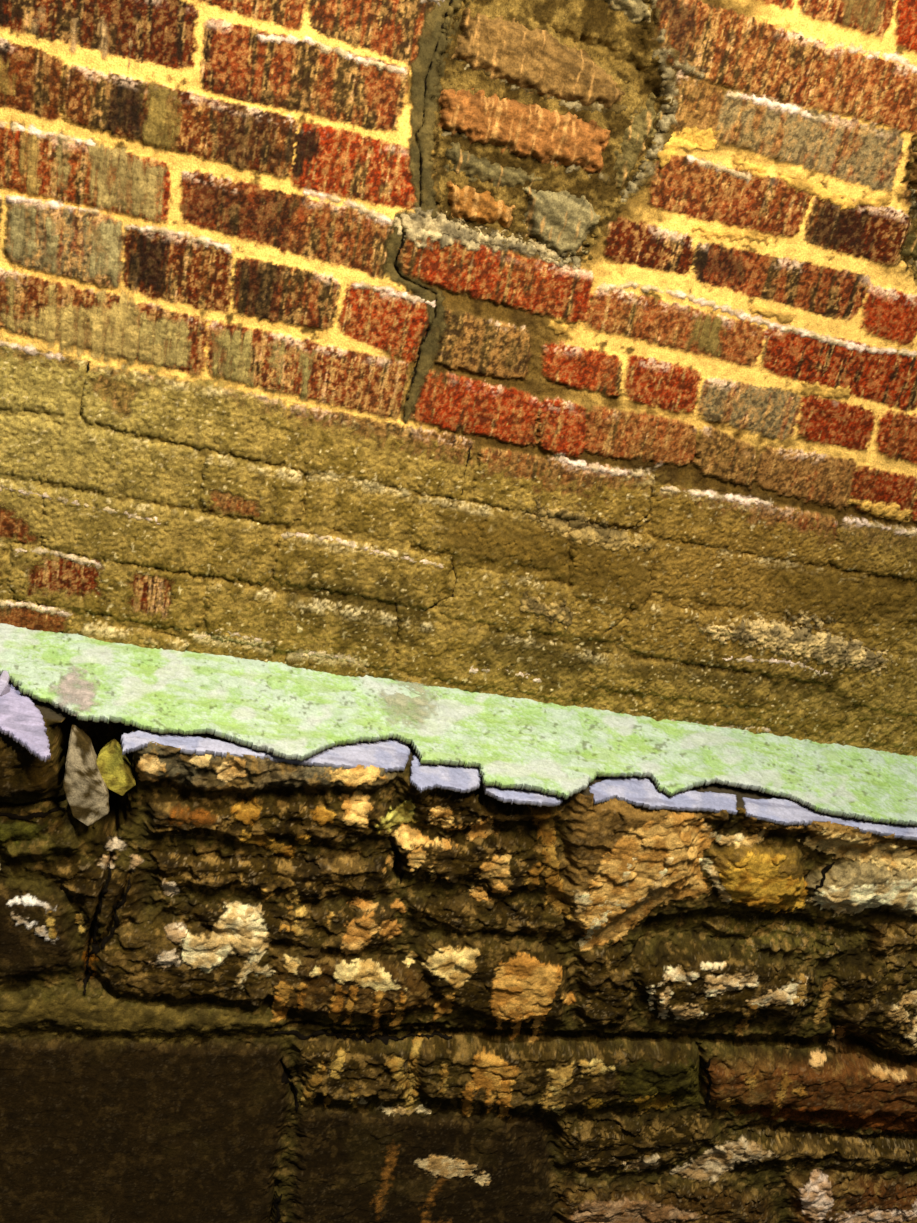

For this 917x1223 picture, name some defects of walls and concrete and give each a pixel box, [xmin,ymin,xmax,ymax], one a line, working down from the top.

spalling [433,0,704,269]
crack [384,0,474,423]
peeling [135,754,166,782]
peeling [188,754,246,781]
peeling [231,765,498,882]
peeling [98,837,144,871]
peeling [161,882,180,896]
peeling [469,854,512,901]
crack [83,863,132,995]